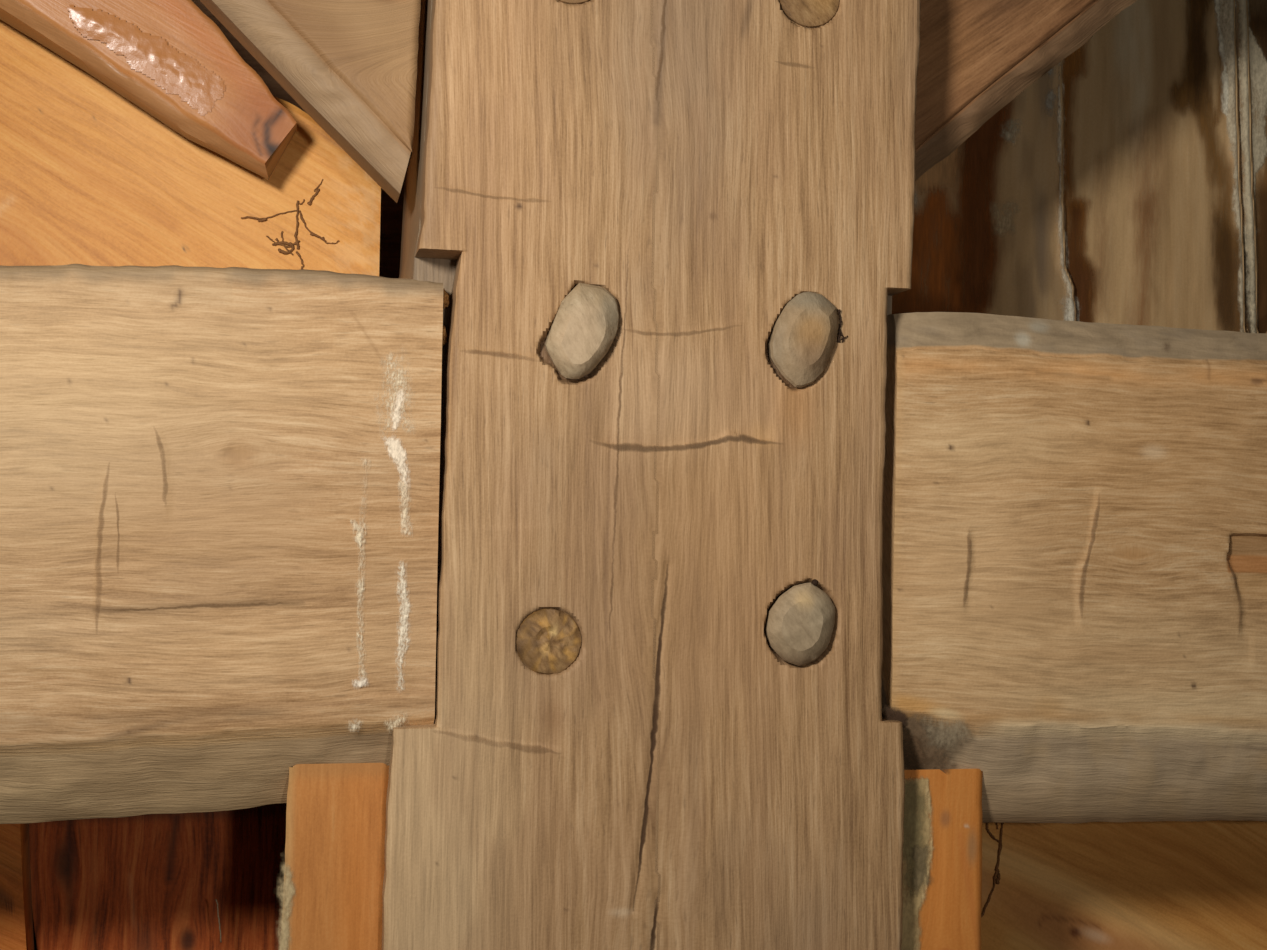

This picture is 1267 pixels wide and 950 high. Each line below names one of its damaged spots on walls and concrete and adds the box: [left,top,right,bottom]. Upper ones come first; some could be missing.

damp [914,148,958,201]
damp [1172,0,1267,333]
damp [384,390,412,534]
damp [351,520,365,547]
damp [354,564,368,687]
crack [638,589,666,873]
crack [650,905,658,950]